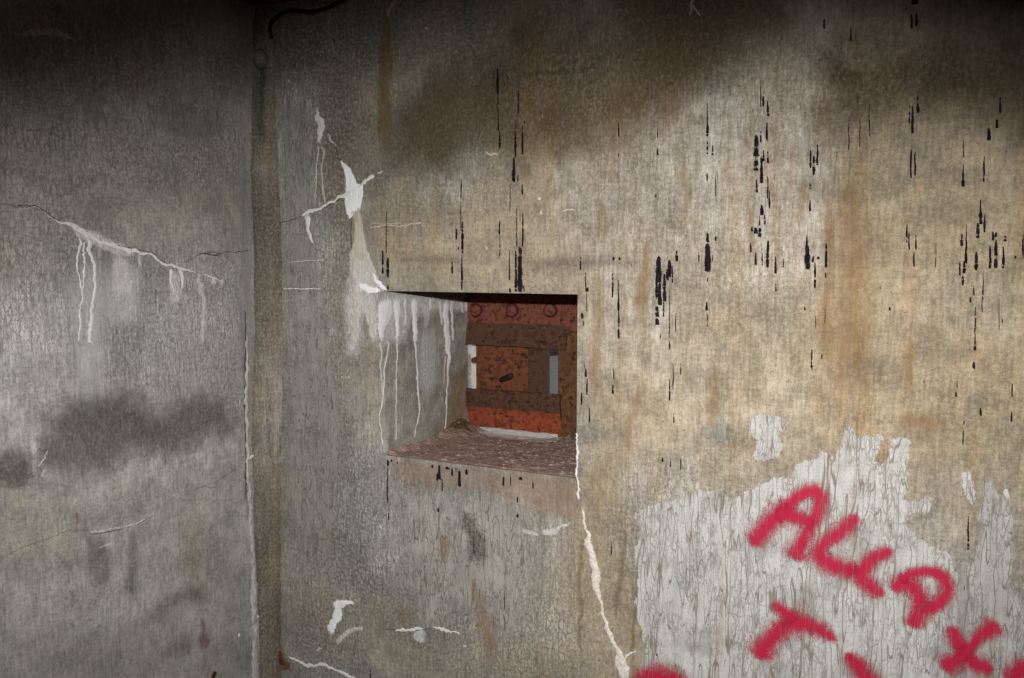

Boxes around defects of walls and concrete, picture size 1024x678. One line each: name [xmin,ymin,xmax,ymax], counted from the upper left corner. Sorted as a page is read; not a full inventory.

leakage [2,204,223,386]
crack [280,170,383,244]
leakage [314,108,468,520]
leakage [403,0,784,292]
leakage [655,250,678,349]
leakage [809,144,819,212]
leakage [804,236,827,288]
crack [243,312,259,678]
spalling [327,600,362,644]
crack [575,433,636,678]
peeling [749,413,785,462]
peeling [634,424,1024,678]